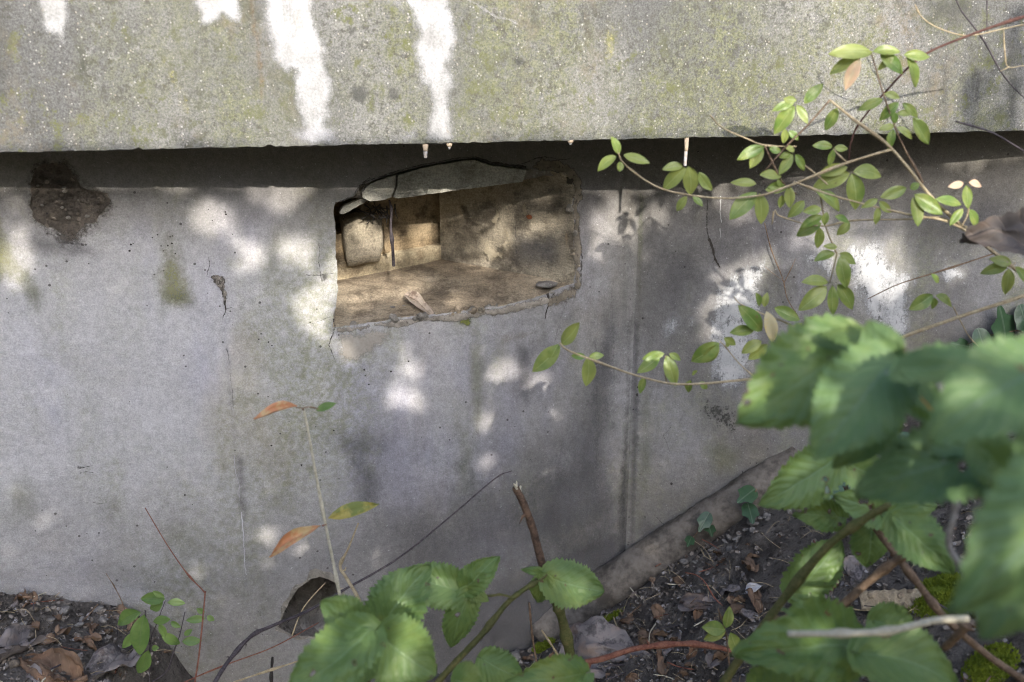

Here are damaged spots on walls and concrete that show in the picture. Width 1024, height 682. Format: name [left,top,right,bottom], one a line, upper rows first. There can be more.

damp [267,0,331,143]
damp [407,0,457,140]
spalling [28,161,111,242]
flaking render [337,159,583,333]
spalling [275,568,345,640]